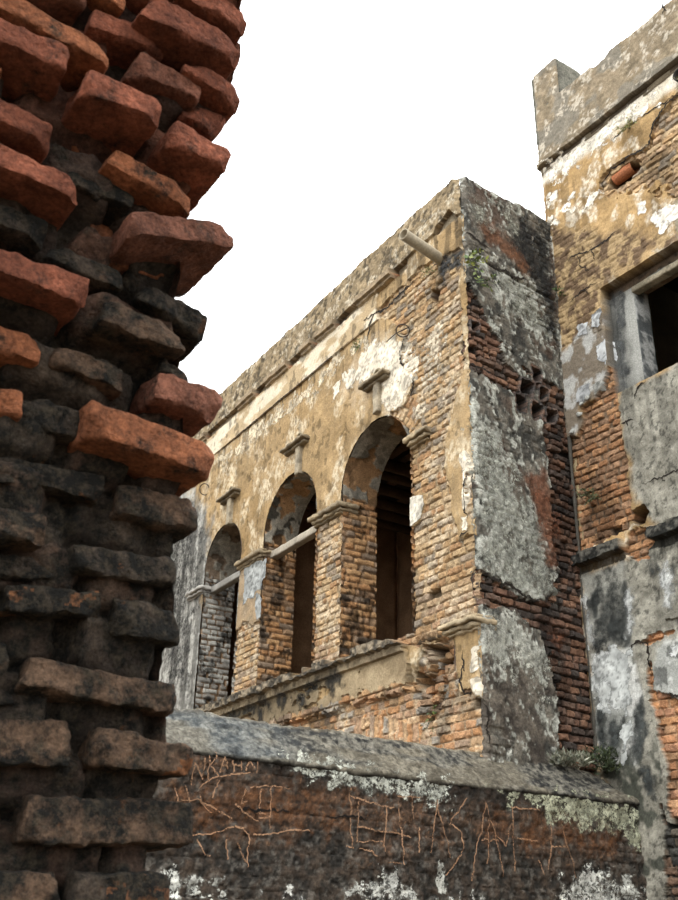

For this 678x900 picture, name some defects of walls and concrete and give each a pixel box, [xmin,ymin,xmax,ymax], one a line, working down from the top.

flaking render [538,85,678,234]
water stain [512,216,558,336]
flaking render [214,249,654,776]
water stain [163,529,203,686]
crack [459,649,491,743]
water stain [580,572,639,652]
water stain [596,696,657,800]
water stain [649,562,675,607]
flaking render [647,631,678,657]
flaking render [649,663,678,900]